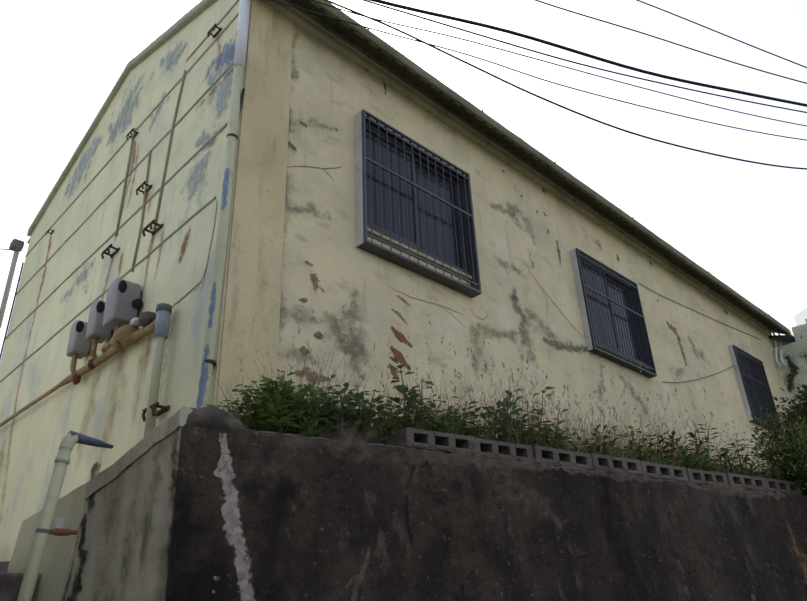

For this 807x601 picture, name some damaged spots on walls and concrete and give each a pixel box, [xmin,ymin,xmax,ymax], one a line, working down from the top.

peeling [206,42,236,117]
peeling [65,77,142,196]
peeling [187,131,214,200]
peeling [221,168,229,210]
peeling [305,261,325,292]
peeling [197,344,210,409]
leakage [330,292,365,376]
spalling [390,326,413,381]
leakage [471,289,590,360]
corrosion [667,321,687,366]
leakage [785,357,799,391]
leakage [62,490,97,601]